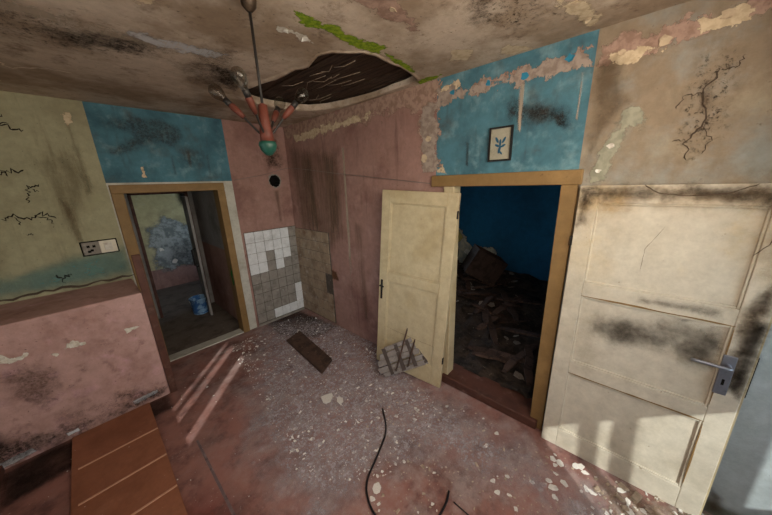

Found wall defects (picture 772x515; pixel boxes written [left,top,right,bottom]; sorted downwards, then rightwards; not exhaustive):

spalling [232,0,772,183]
crack [672,56,745,160]
crack [0,168,56,235]
peeling [145,216,194,270]
peeling [0,352,29,364]
leakage [0,420,91,468]